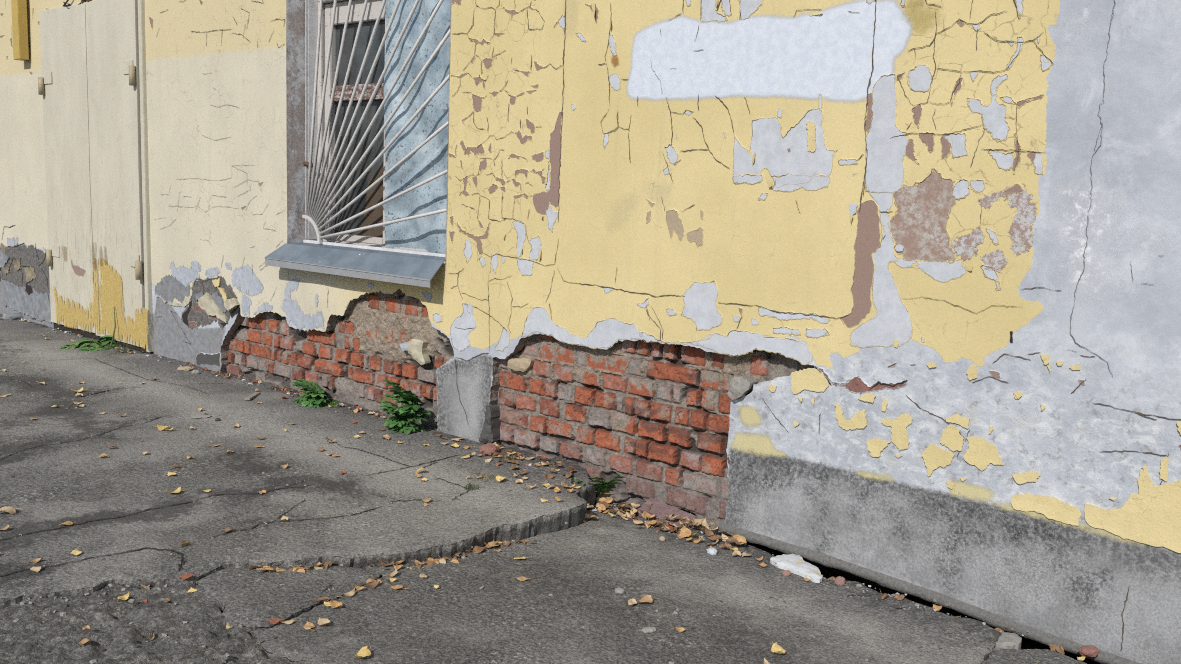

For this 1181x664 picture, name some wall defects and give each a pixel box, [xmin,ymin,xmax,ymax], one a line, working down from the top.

peeling [670,0,763,23]
peeling [585,3,631,160]
crack [448,0,685,422]
crack [1070,0,1116,377]
crack [0,437,469,540]
flaking render [0,225,477,428]
flaking render [479,73,1037,536]
crack [718,302,844,319]
flaking render [966,331,1095,399]
peeling [922,414,1181,553]
crack [1102,450,1169,485]
crack [1094,403,1181,420]